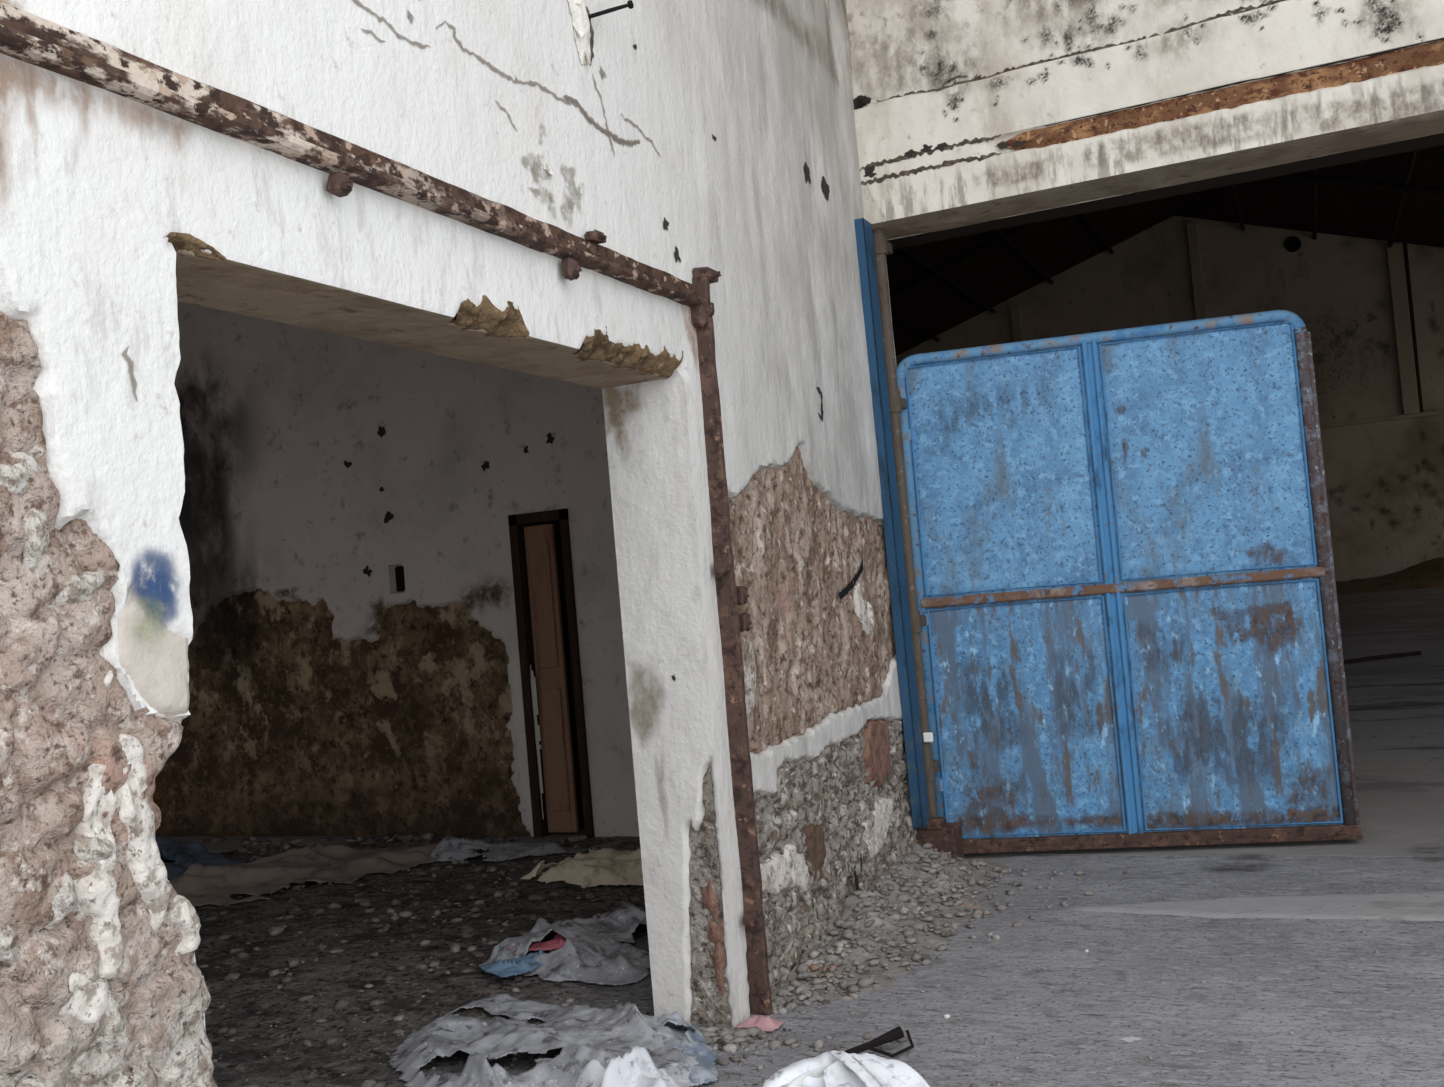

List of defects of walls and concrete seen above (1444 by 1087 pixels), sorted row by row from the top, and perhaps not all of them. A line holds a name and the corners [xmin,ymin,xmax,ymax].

crack [353,0,660,157]
leakage [883,5,1004,121]
leakage [1023,0,1135,84]
rust [994,38,1444,150]
leakage [1314,0,1402,42]
spalling [449,295,530,338]
spalling [573,326,683,379]
spalling [729,447,896,754]
spalling [0,312,544,1087]
spalling [689,763,731,1025]
spalling [754,719,917,993]